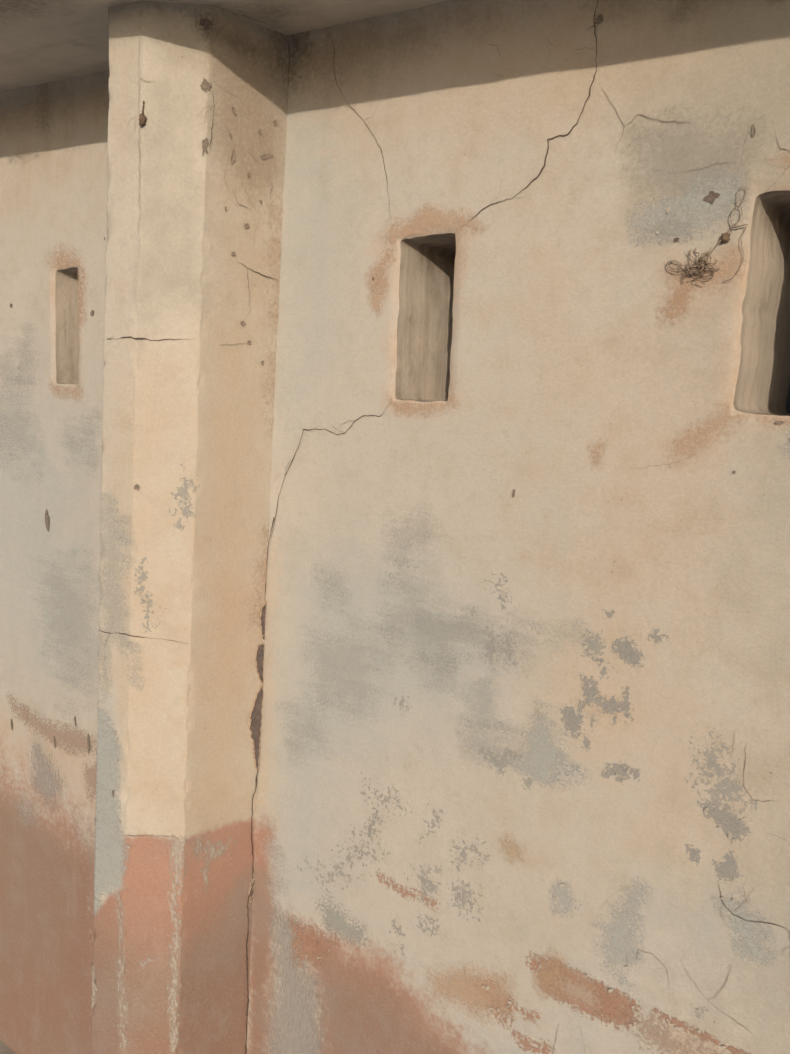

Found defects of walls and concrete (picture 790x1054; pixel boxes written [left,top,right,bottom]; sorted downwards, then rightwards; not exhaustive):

crack [326,28,390,214]
crack [462,0,692,226]
crack [201,82,280,345]
crack [107,334,184,342]
peeling [7,694,130,1049]
crack [100,622,182,646]
crack [245,399,392,1054]
peeling [558,629,670,752]
peeling [601,760,640,785]
peeling [685,728,758,884]
crack [717,880,790,955]